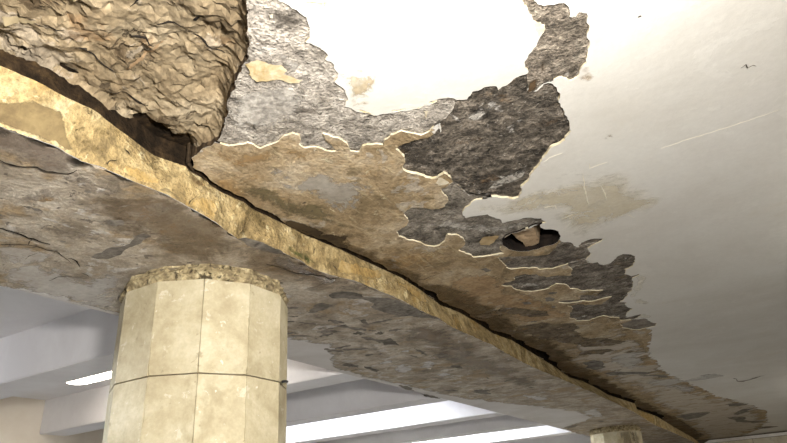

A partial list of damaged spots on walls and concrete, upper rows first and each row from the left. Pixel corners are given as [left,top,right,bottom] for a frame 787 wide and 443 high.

crack [59,62,79,73]
crack [131,108,191,147]
crack [0,160,75,174]
spalling [0,0,668,378]
crack [0,228,89,281]
crack [267,264,339,280]
crack [537,350,565,374]
peeling [726,403,777,429]